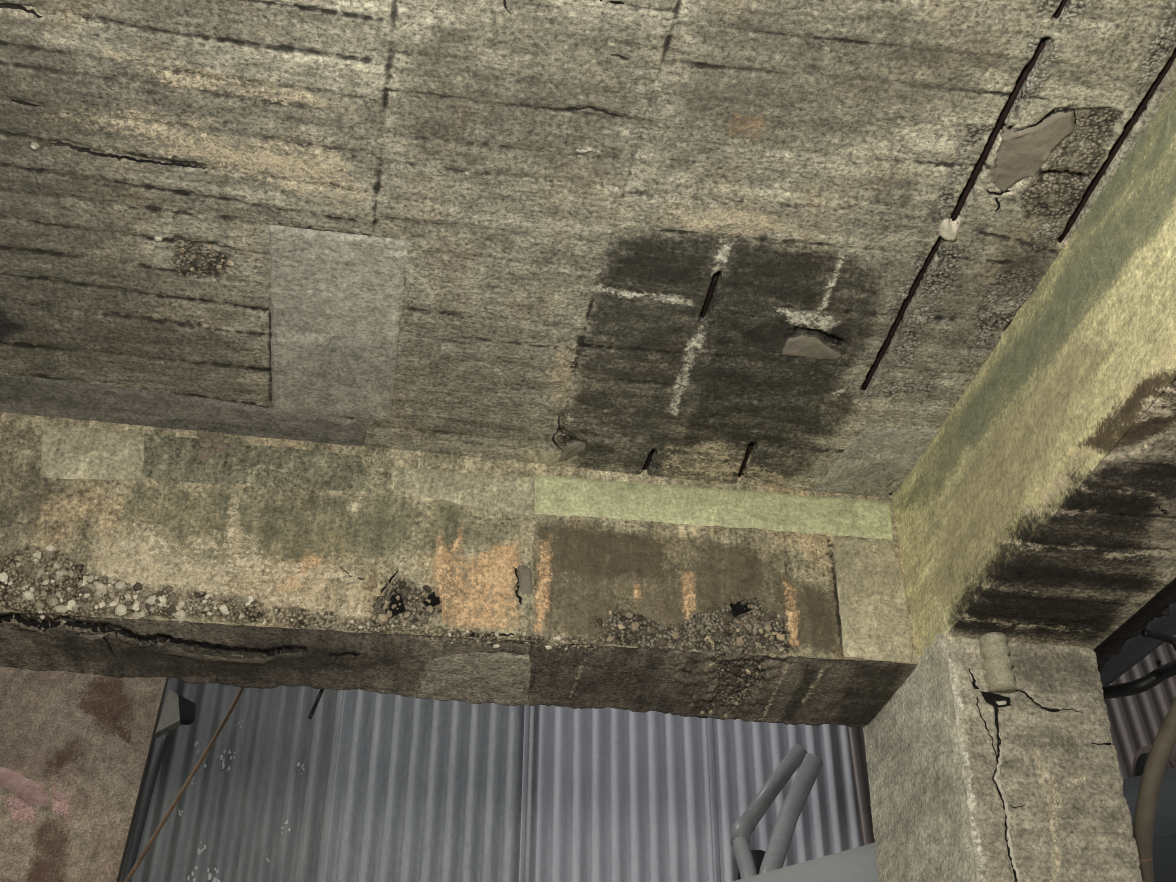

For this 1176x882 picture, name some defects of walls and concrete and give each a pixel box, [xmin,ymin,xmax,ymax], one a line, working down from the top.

spalling [859,0,1176,402]
leakage [545,209,884,491]
spalling [696,272,851,361]
leakage [949,346,1176,645]
crack [0,606,300,664]
crack [328,650,361,658]
spalling [0,544,794,718]
rust [433,534,521,633]
rust [533,541,552,633]
crack [969,669,1080,882]